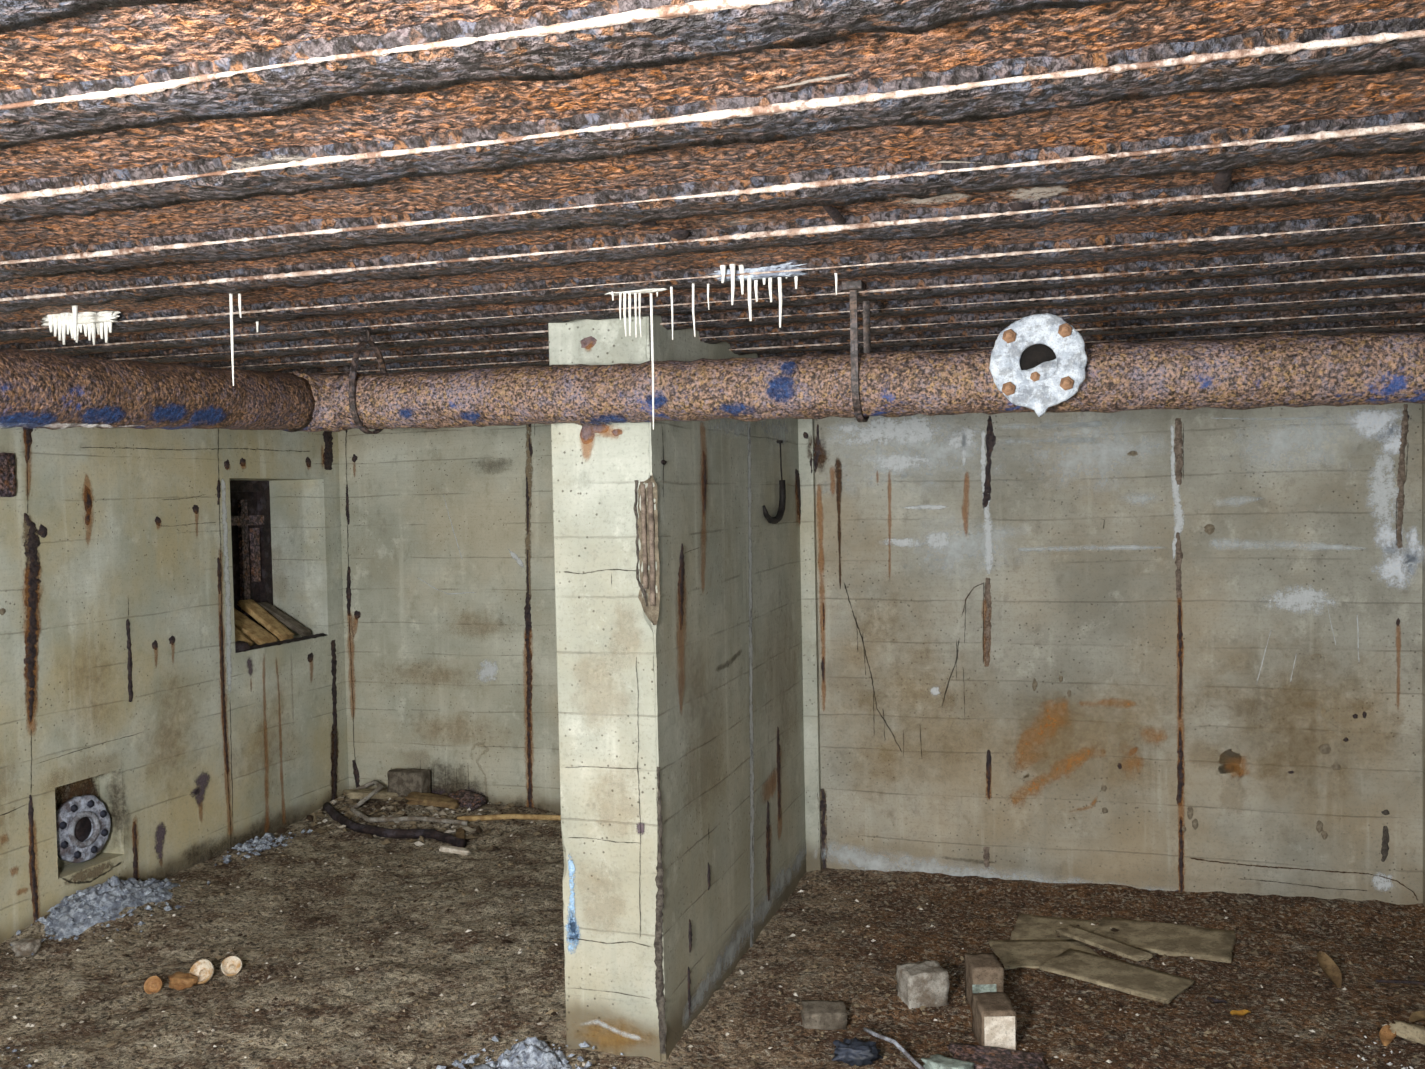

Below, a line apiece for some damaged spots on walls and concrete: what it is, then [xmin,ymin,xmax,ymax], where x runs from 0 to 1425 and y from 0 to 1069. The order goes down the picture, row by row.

corrosion [580,336,597,349]
corrosion [640,221,690,240]
leakage [0,122,1425,265]
leakage [0,176,1425,323]
leakage [27,252,1425,374]
corrosion [580,424,623,444]
spalling [633,475,660,625]
corrosion [677,543,685,630]
leakage [1348,410,1424,587]
crack [844,584,922,755]